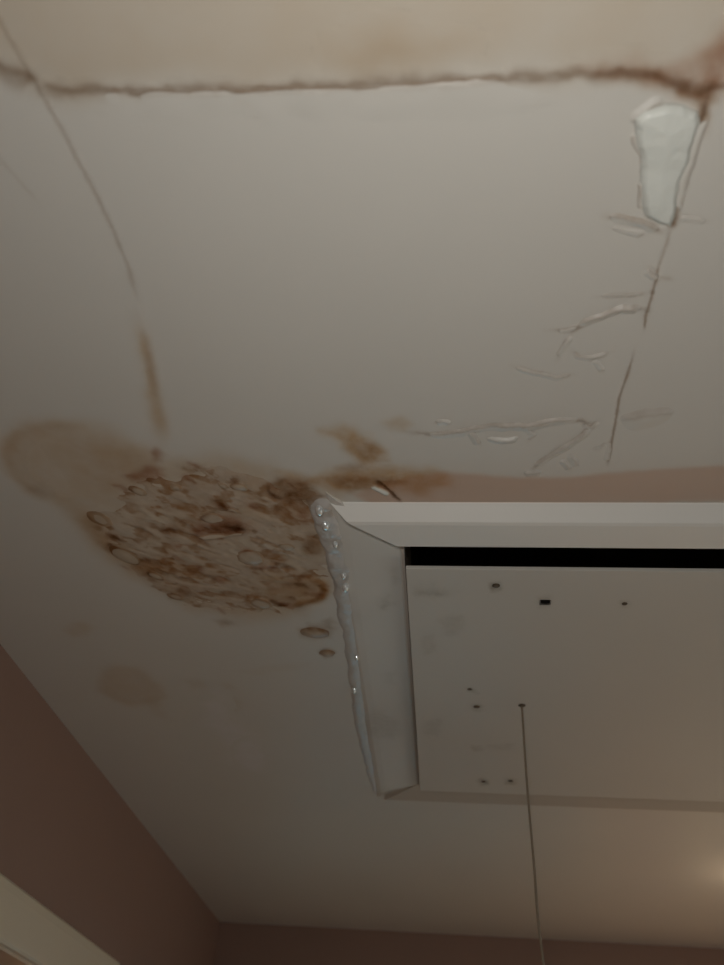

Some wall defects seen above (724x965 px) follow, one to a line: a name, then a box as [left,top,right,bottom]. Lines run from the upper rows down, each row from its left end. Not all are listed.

crack [88,77,563,127]
peeling [629,96,700,227]
crack [676,117,709,213]
water stain [370,484,396,497]
water stain [86,466,377,795]